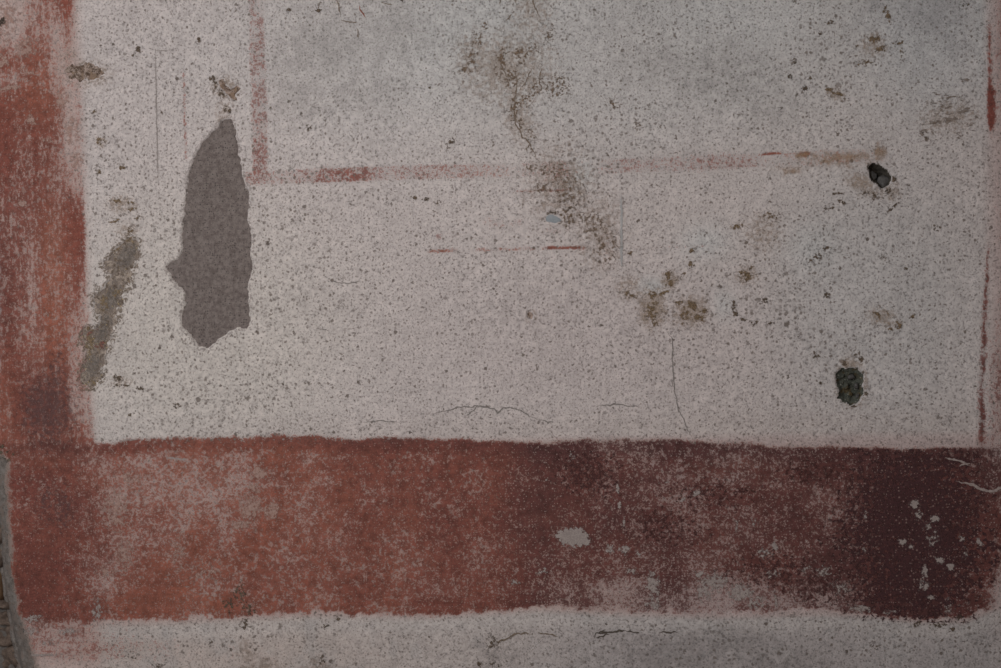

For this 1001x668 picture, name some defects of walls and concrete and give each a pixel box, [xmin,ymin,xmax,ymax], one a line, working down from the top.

crack [500,62,542,157]
flaking render [164,75,257,352]
crack [436,405,553,423]
peeling [555,527,590,548]